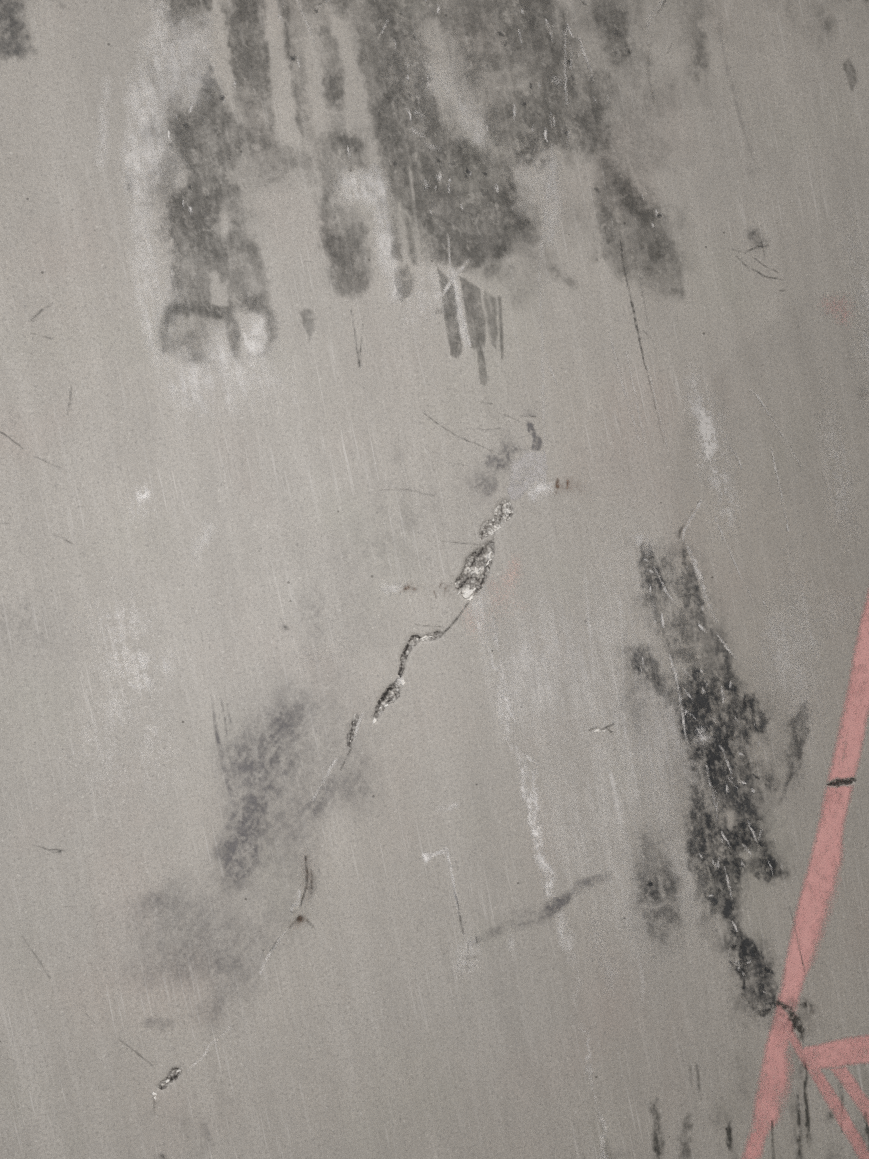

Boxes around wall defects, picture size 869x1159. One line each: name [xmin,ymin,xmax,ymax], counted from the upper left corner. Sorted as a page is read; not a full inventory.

leakage [94,0,314,437]
leakage [332,0,602,445]
leakage [613,178,655,225]
crack [259,857,308,973]
crack [313,715,363,800]
leakage [463,463,782,1016]